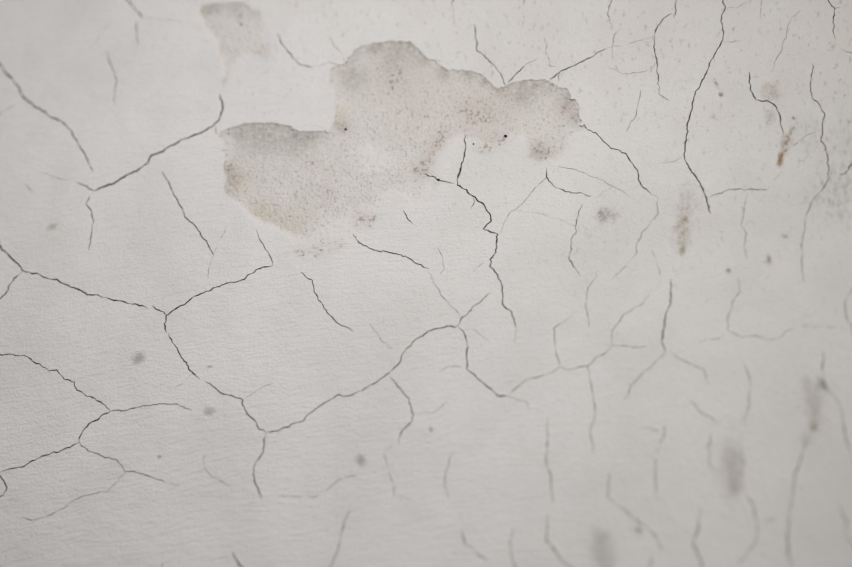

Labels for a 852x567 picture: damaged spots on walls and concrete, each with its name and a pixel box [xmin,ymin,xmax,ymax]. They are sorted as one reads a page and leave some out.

peeling [196,0,277,94]
crack [278,35,341,68]
peeling [217,39,589,266]
crack [451,0,677,130]
crack [666,0,780,258]
crack [773,10,801,69]
crack [749,66,852,283]
crack [0,64,708,526]
crack [700,278,852,342]
crack [545,419,571,567]
crack [736,442,806,567]